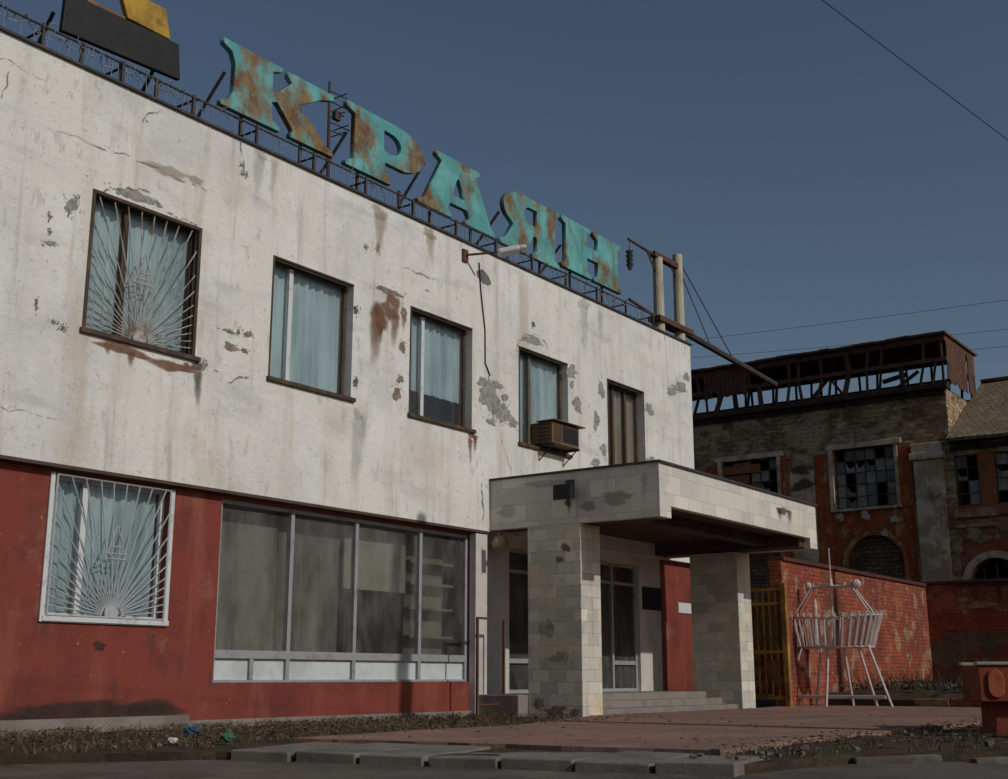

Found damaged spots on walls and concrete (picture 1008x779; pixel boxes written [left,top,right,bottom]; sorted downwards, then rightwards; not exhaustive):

rust [372,294,407,346]
rust [94,341,196,373]
spalling [476,375,519,430]
water stain [931,631,1008,669]